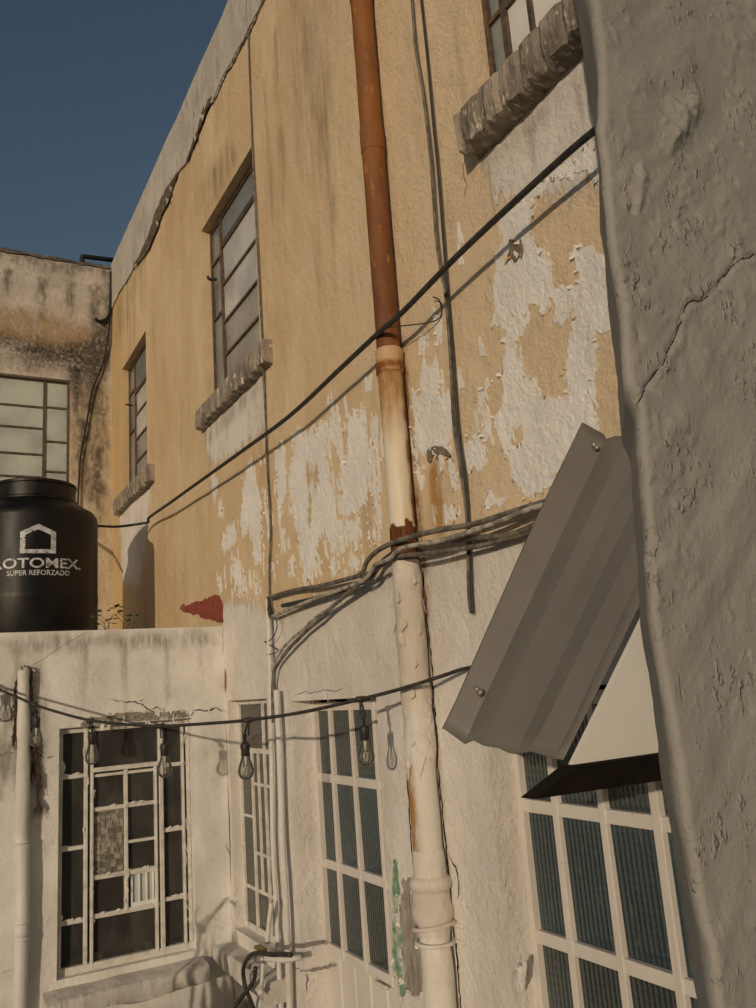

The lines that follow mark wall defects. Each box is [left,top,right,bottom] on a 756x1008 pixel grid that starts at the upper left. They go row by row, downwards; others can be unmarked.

damp [3,288,110,496]
peeling [210,371,384,605]
peeling [408,143,611,526]
crack [636,254,754,404]
peeling [392,559,437,782]
flaking render [391,859,423,1002]